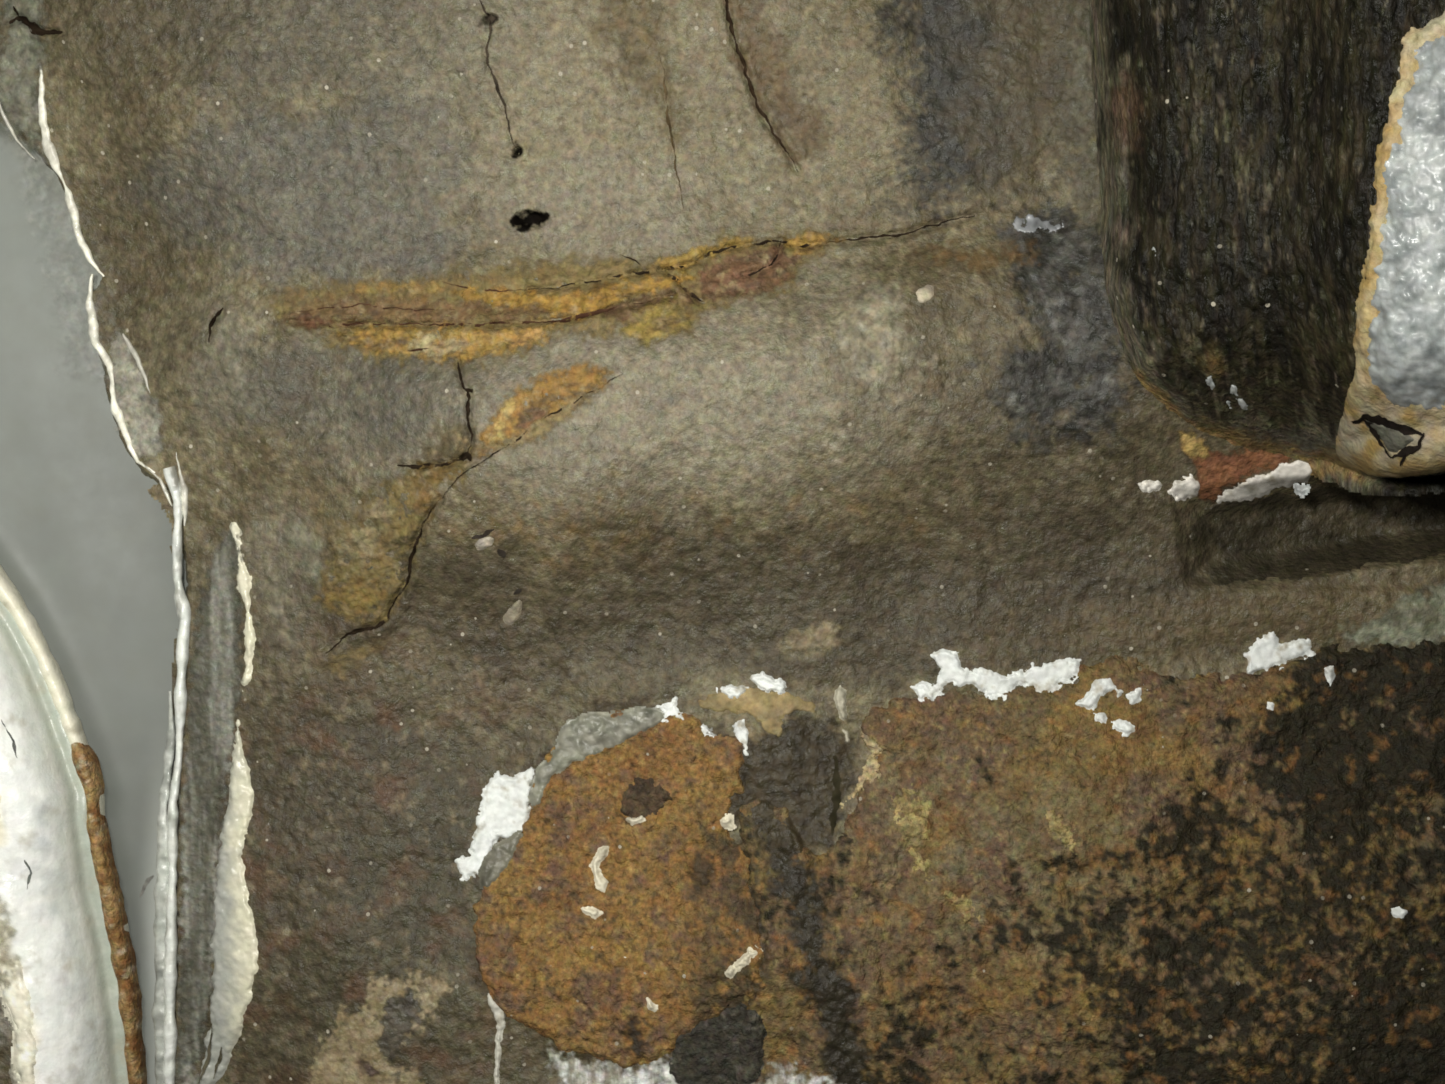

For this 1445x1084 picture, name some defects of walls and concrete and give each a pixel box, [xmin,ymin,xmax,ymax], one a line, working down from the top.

crack [479,0,518,149]
crack [725,0,798,172]
peeling [0,69,188,526]
rust [271,230,838,367]
crack [291,215,975,654]
peeling [1138,474,1200,501]
water stain [1205,376,1248,410]
peeling [1216,460,1312,504]
water stain [1293,483,1311,498]
water stain [829,755,841,835]
rust [71,742,147,1084]
rust [472,698,768,1069]